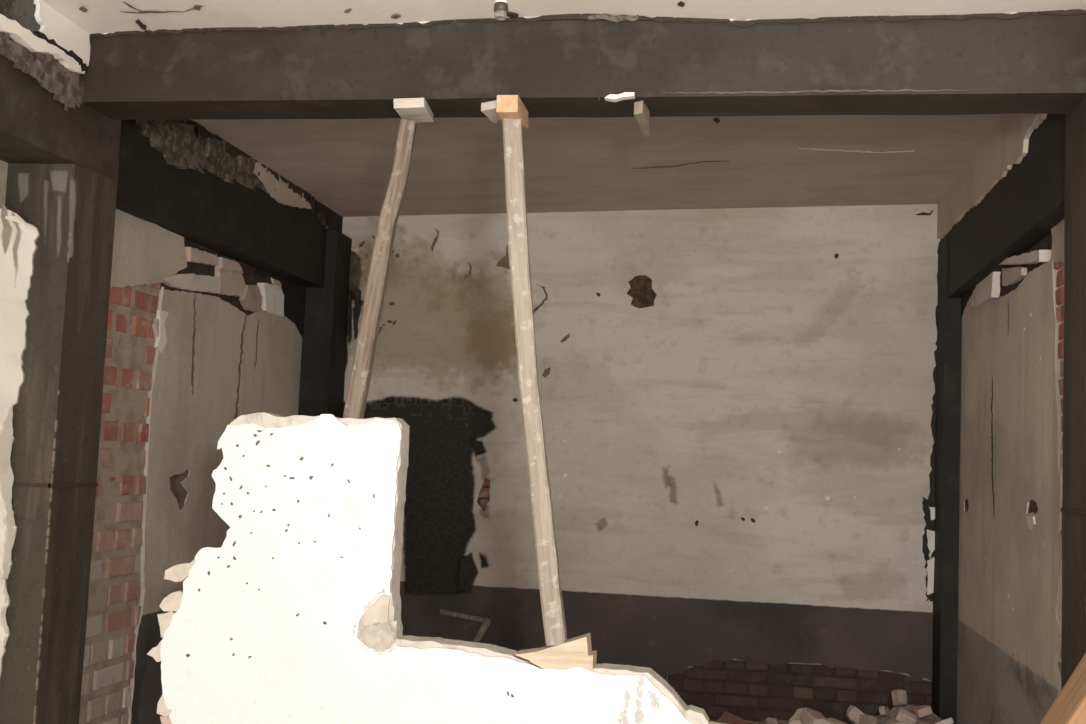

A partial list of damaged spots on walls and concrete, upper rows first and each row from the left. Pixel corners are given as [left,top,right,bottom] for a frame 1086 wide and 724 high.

spalling [0,0,114,111]
spalling [135,119,312,209]
flaking render [937,114,1047,239]
leakage [1,203,21,270]
crack [189,294,197,395]
crack [234,312,259,419]
leakage [345,288,364,369]
spalling [496,245,510,269]
spalling [627,275,657,308]
flaking render [993,233,1065,476]
flaking render [79,239,272,724]
crack [988,377,996,515]